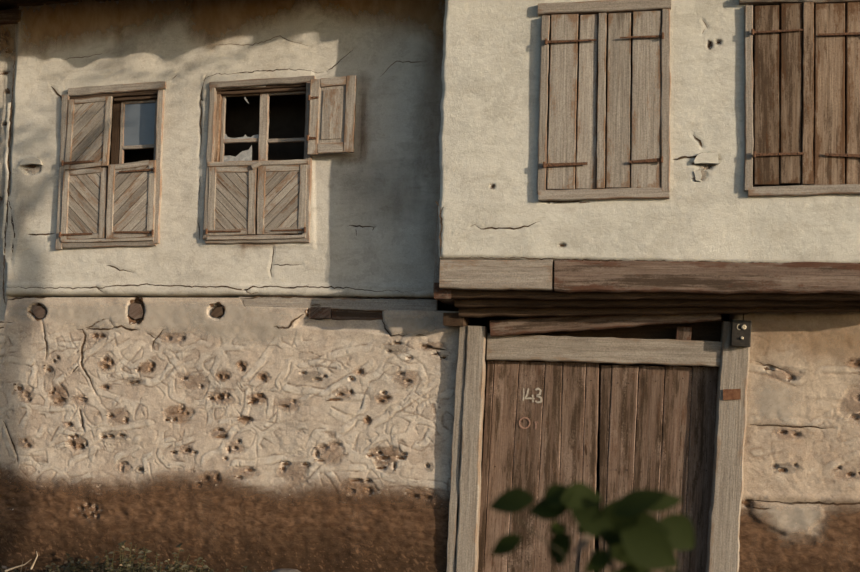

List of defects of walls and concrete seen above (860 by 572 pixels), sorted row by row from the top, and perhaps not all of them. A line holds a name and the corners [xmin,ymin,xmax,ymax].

crack [211,36,307,50]
crack [380,49,445,258]
crack [675,135,704,160]
spalling [691,153,720,182]
crack [0,50,421,332]
crack [472,222,536,230]
crack [469,256,769,264]
crack [382,320,445,359]
crack [72,318,166,393]
crack [750,422,825,430]
crack [3,421,18,462]